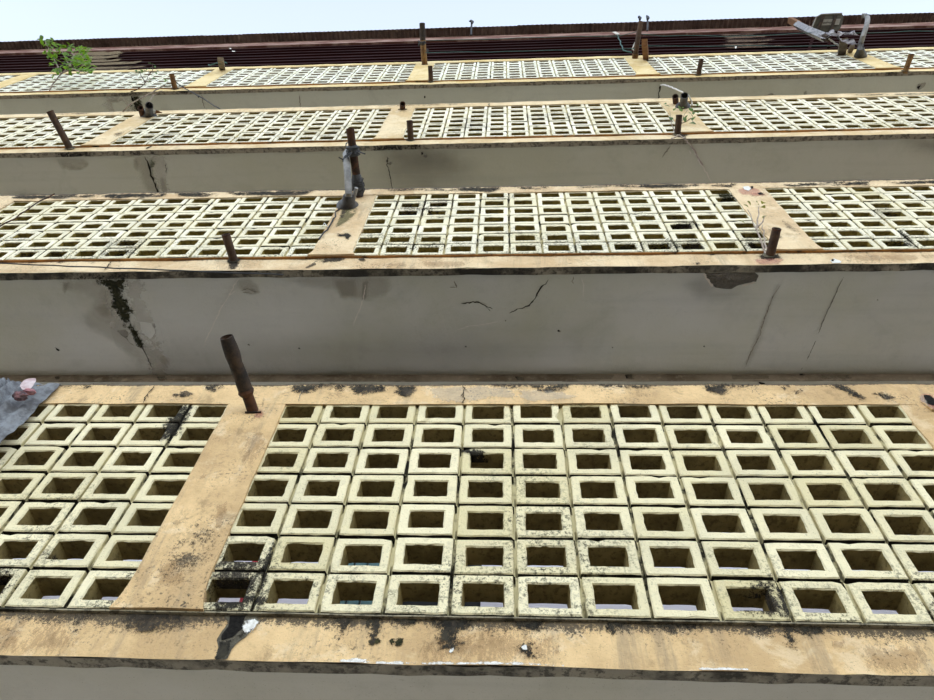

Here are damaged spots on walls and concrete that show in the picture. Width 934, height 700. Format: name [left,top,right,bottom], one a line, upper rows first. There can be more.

crack [145,145,167,192]
crack [450,278,548,313]
flaking render [703,272,758,289]
crack [96,261,155,403]
crack [746,289,778,364]
leakage [157,391,200,445]
leakage [119,613,183,636]
leakage [331,604,480,651]
leakage [510,621,548,635]
leakage [603,622,630,635]
leakage [642,624,702,633]